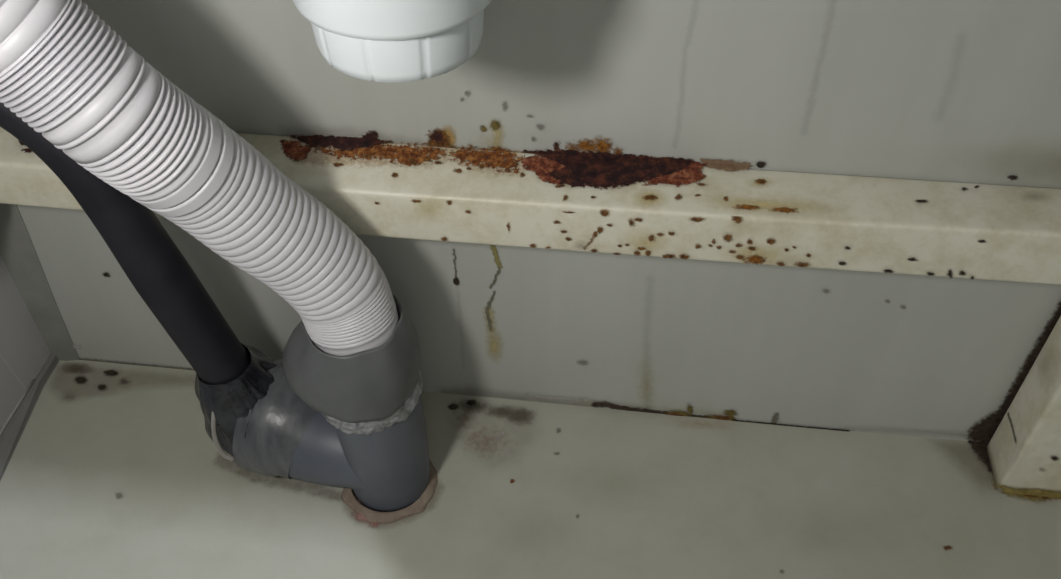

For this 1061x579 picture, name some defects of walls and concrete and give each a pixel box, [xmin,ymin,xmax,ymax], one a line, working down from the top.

corrosion [280,115,766,241]
corrosion [724,196,797,223]
corrosion [583,210,612,253]
corrosion [613,232,811,267]
corrosion [486,245,502,351]
leakage [69,359,195,390]
leakage [497,408,528,421]
corrosion [592,402,736,421]